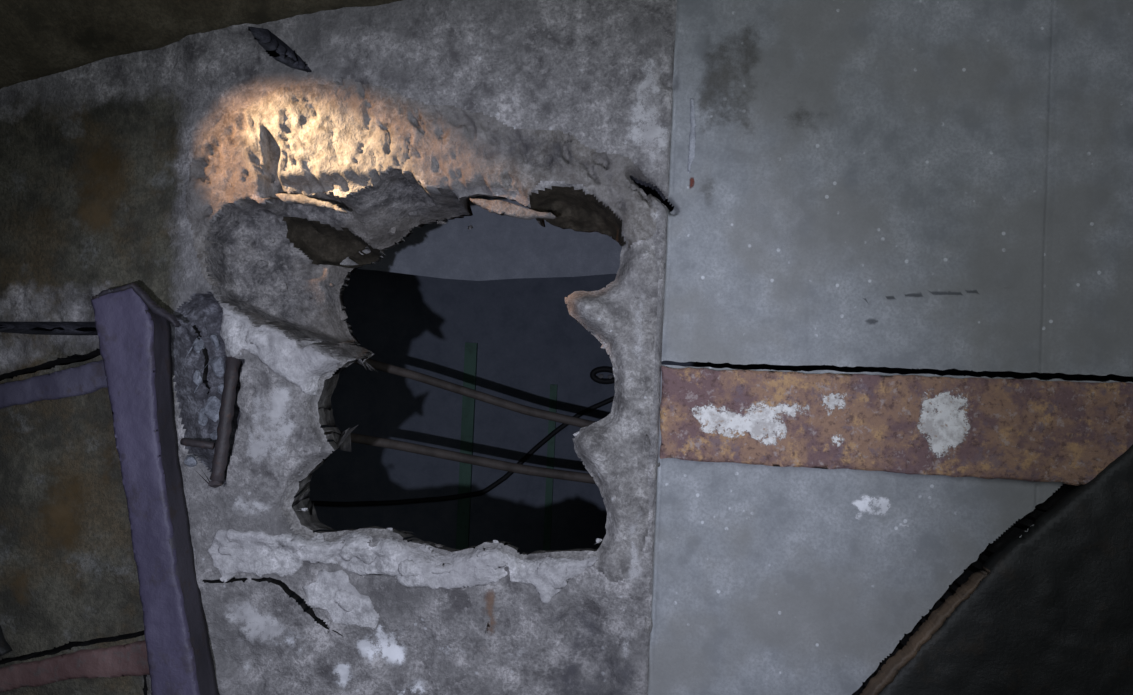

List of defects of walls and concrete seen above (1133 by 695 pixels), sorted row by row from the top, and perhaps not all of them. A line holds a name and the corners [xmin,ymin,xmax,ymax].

spalling [170,168,665,630]
water stain [852,496,891,519]
crack [202,577,343,636]
water stain [357,625,405,664]
water stain [334,664,352,694]